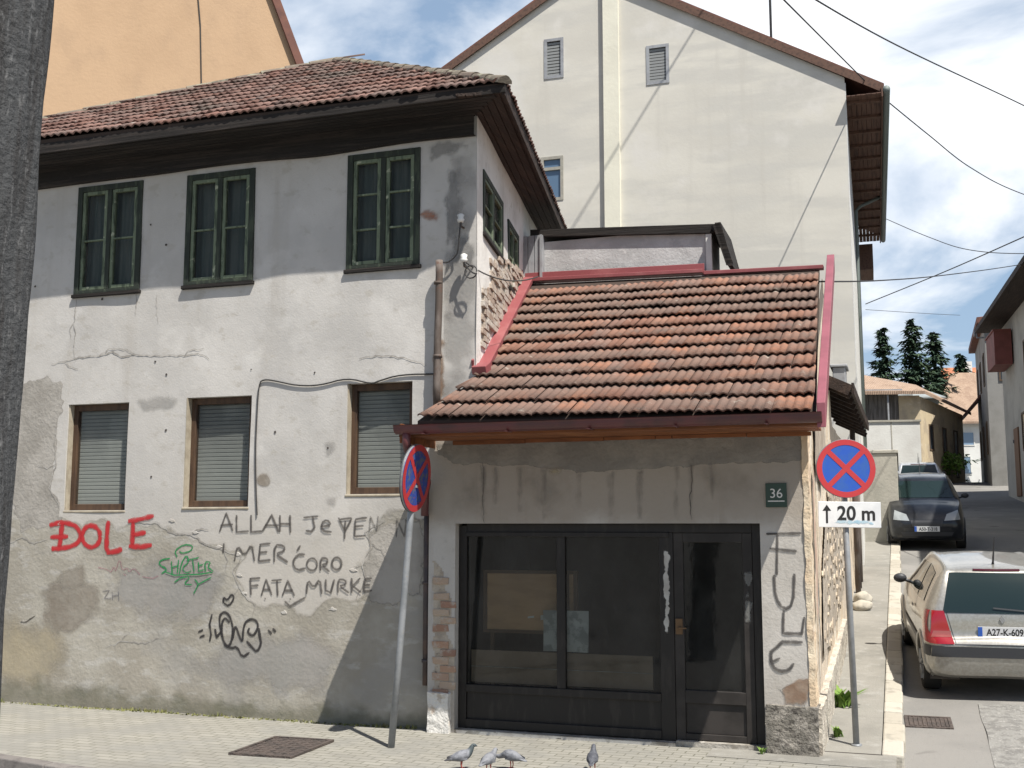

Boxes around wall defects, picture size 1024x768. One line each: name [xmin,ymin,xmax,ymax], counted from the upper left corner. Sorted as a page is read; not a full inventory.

crack [55,298,209,369]
crack [359,355,426,366]
flaking render [480,256,525,350]
peeling [1,376,456,729]
damp [2,567,97,682]